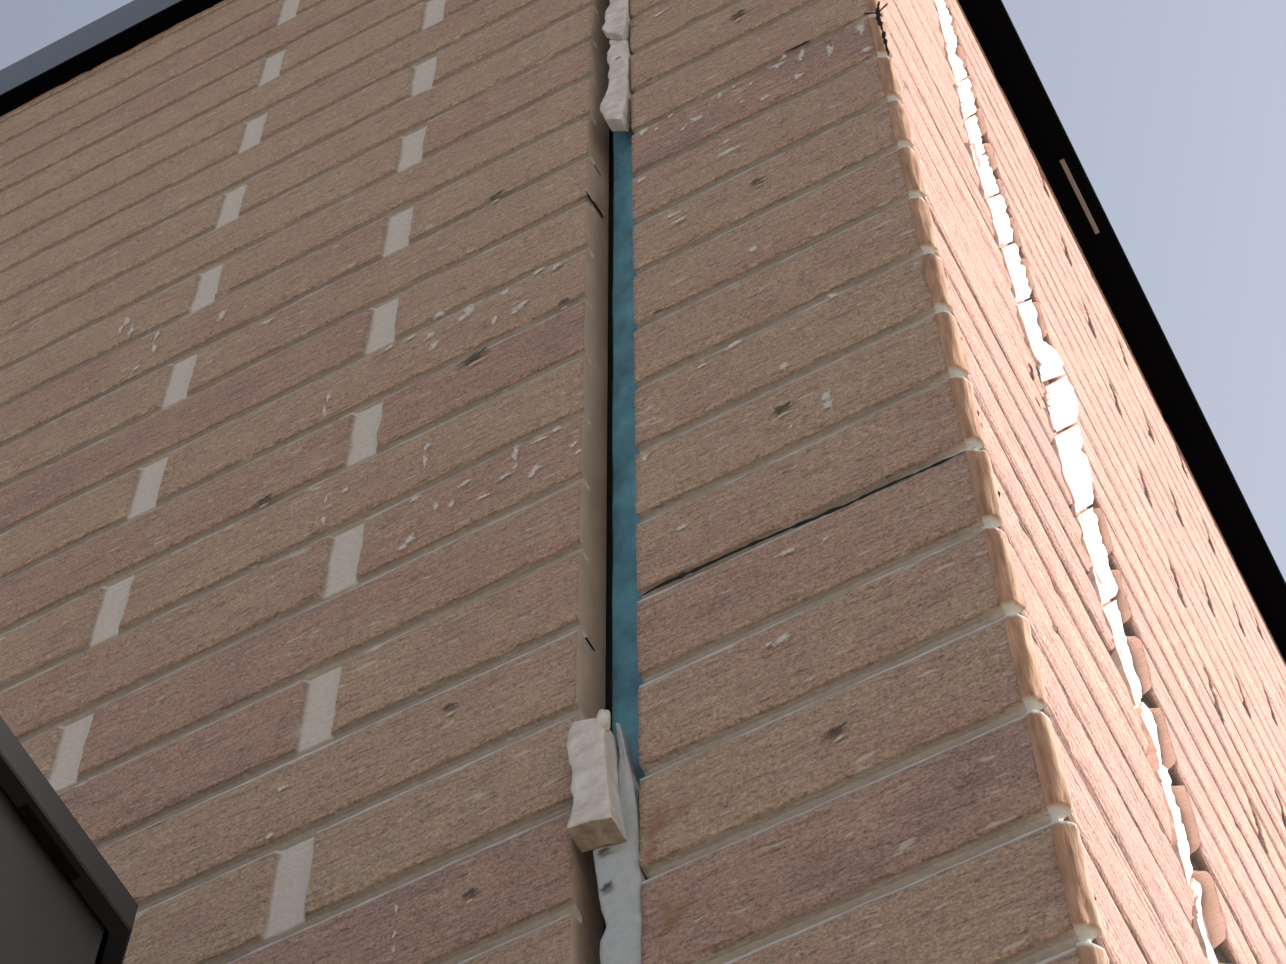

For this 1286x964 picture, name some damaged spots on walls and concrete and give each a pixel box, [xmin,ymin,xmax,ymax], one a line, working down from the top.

crack [639,447,975,598]
peeling [933,0,1209,958]